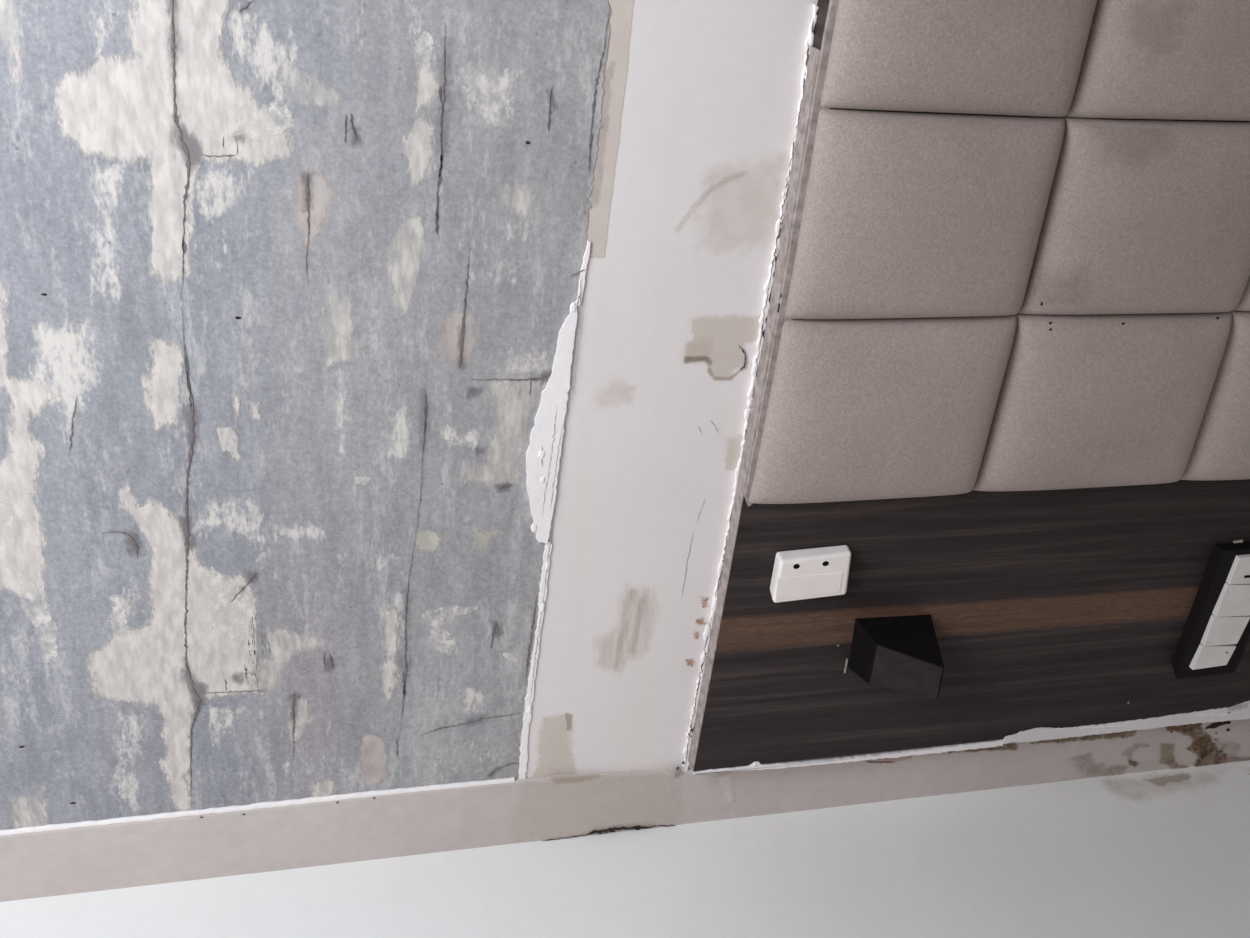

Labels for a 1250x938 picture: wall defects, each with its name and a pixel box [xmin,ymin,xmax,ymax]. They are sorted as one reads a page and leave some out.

flaking render [570,240,591,313]
flaking render [682,4,818,772]
crack [544,825,675,841]